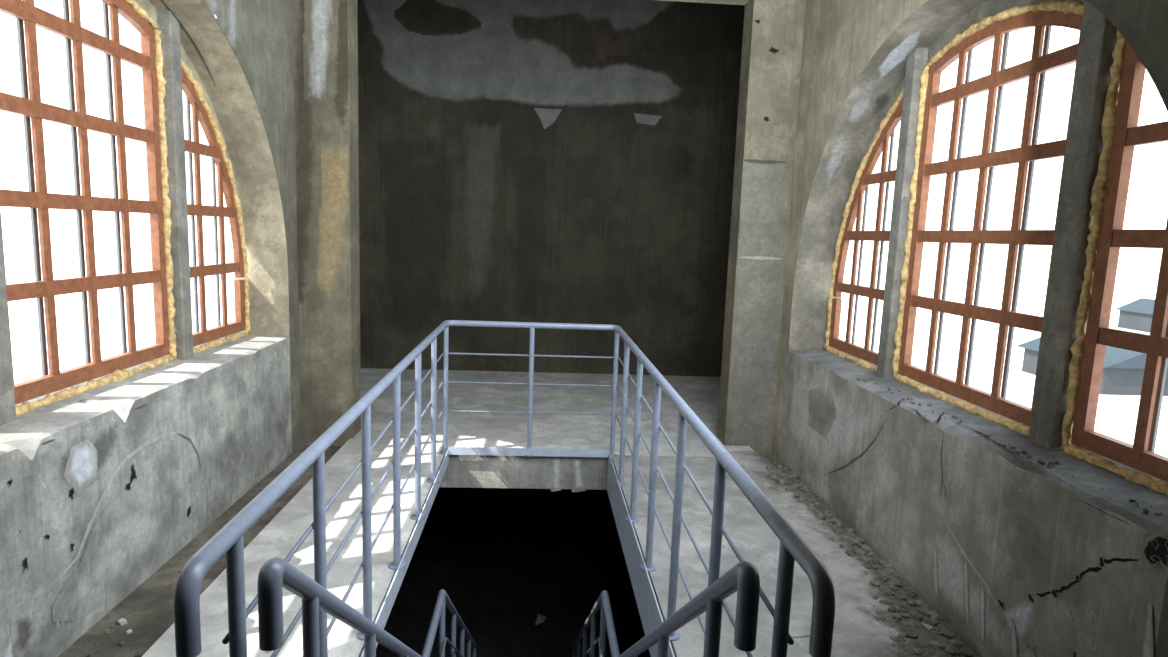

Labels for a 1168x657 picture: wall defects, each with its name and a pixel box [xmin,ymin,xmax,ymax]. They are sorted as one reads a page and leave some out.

peeling [357,0,689,130]
crack [887,400,1138,657]
spalling [1135,527,1168,578]